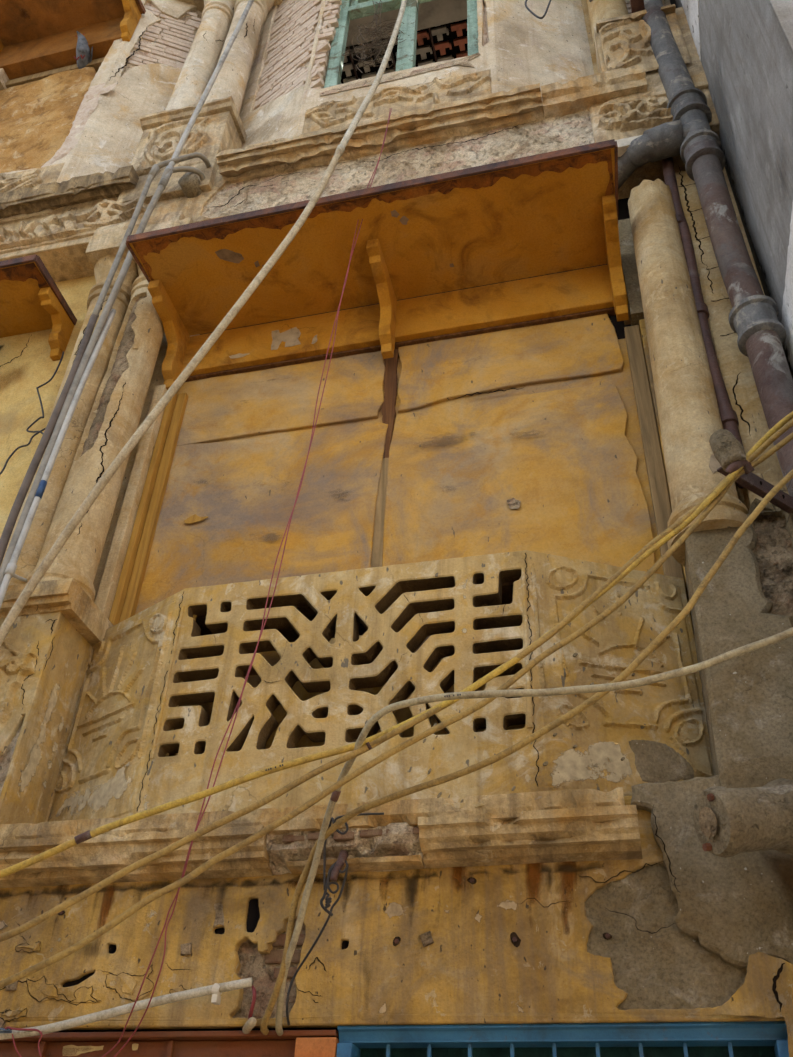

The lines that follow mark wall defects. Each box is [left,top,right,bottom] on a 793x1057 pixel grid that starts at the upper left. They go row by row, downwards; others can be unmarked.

crack [109,28,147,81]
crack [678,166,714,294]
crack [96,382,126,483]
crack [733,372,751,436]
spalling [748,510,793,617]
spalling [0,726,22,795]
peeling [19,683,64,792]
peeling [551,740,694,786]
rust [526,863,541,900]
spalling [233,899,305,1019]
spalling [585,863,793,1057]